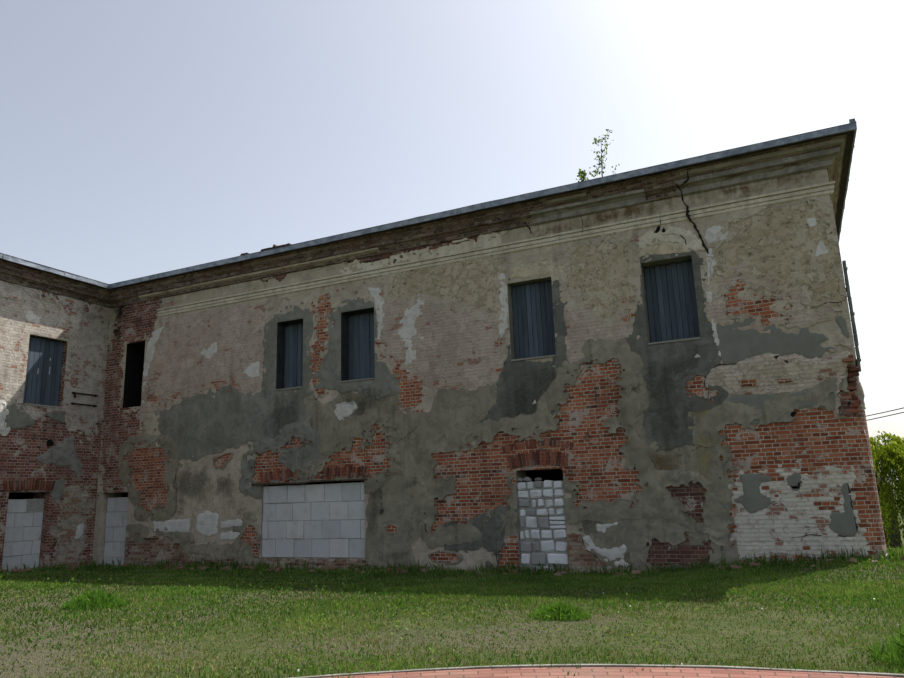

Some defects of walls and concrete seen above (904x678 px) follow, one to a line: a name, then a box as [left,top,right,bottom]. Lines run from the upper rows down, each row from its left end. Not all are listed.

crack [660,171,709,254]
flaking render [0,280,369,569]
flaking render [212,194,889,571]